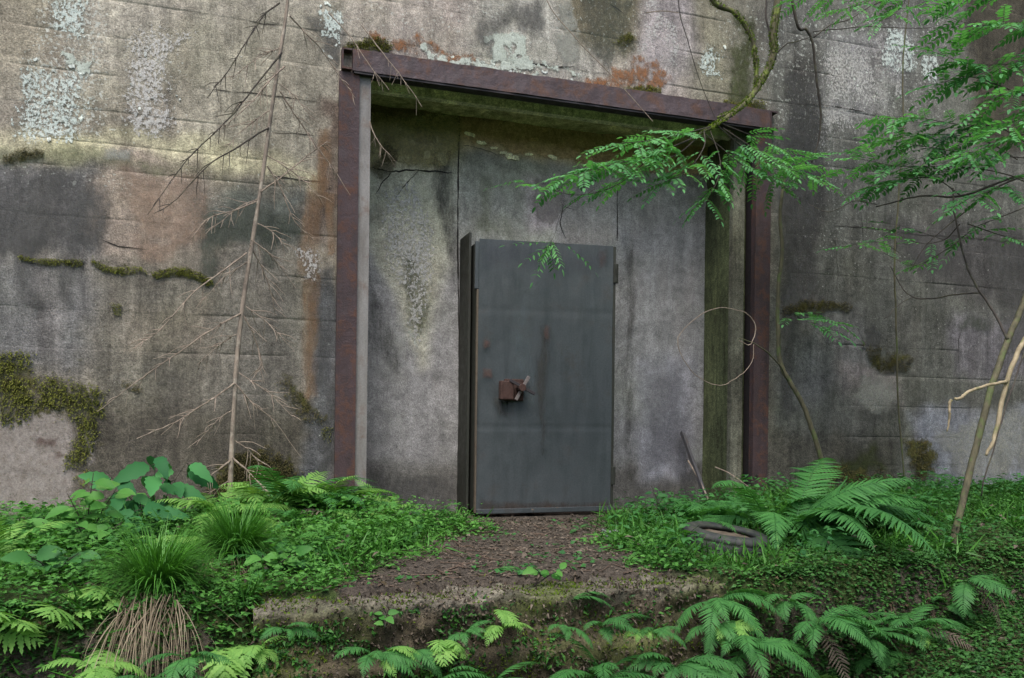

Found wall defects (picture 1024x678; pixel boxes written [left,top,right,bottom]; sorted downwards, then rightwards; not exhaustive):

damp [48,0,90,38]
damp [11,51,95,145]
damp [117,24,196,138]
corrosion [585,55,672,89]
damp [200,205,323,282]
crack [372,120,496,406]
damp [782,28,938,411]